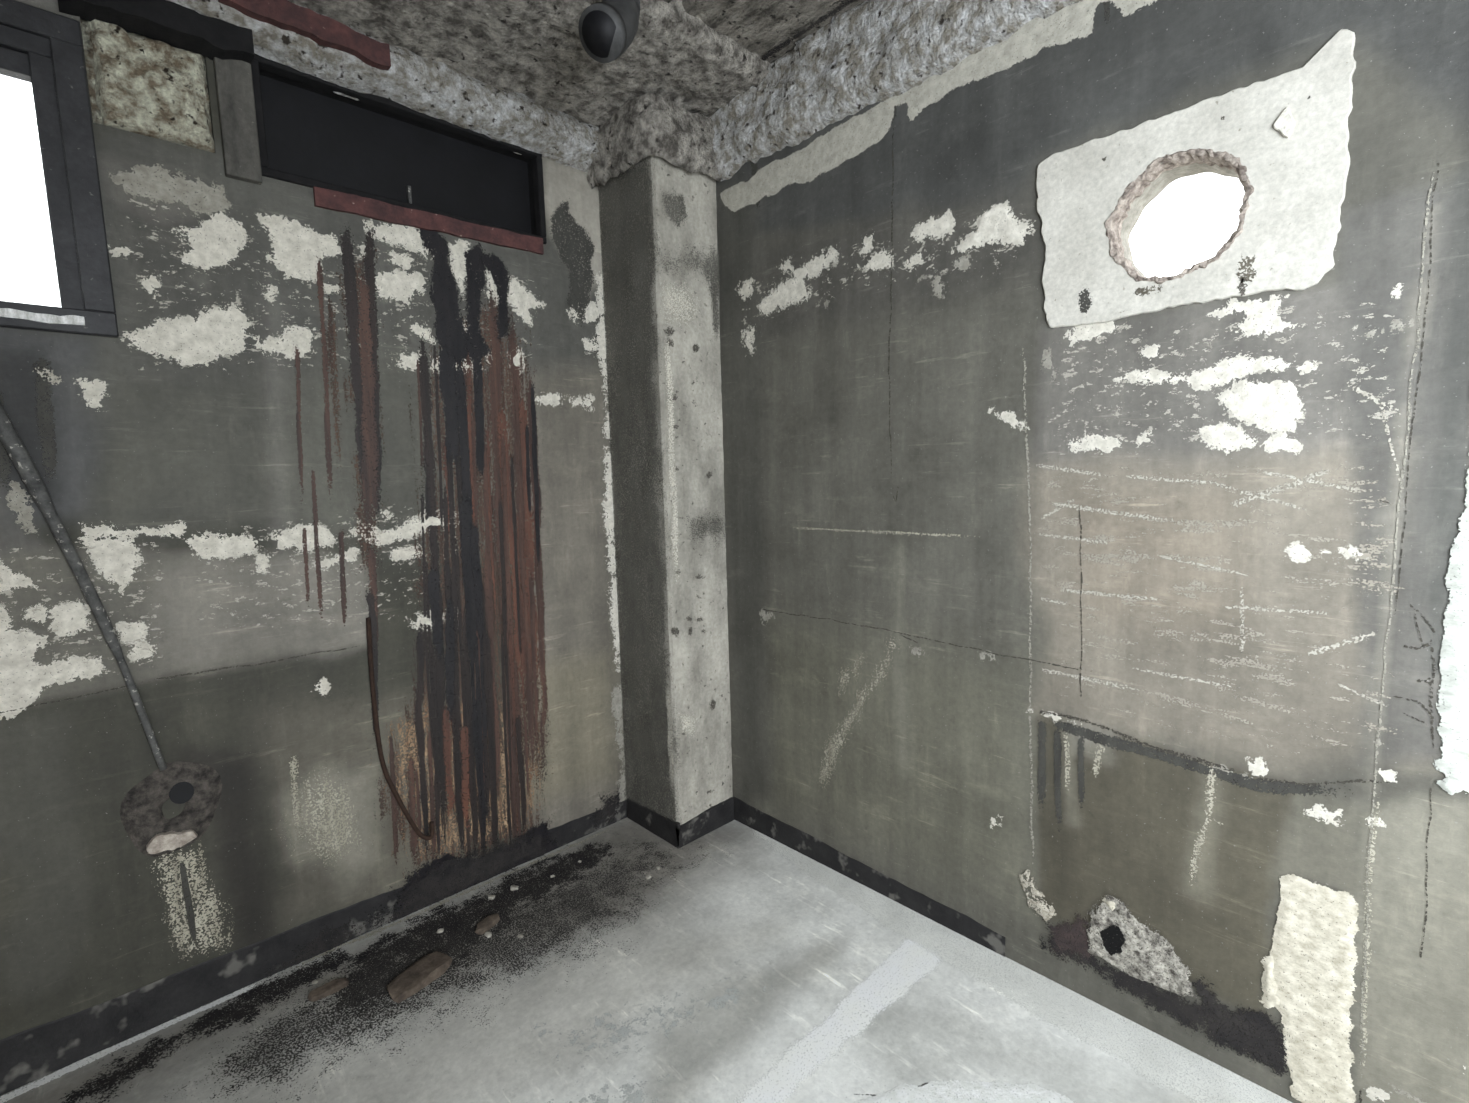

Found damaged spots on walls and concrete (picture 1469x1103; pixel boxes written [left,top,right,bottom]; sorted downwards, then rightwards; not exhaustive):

peeling [720,0,1157,212]
peeling [73,378,110,412]
peeling [107,163,546,378]
peeling [735,200,1036,356]
peeling [987,407,1030,432]
peeling [1041,283,1415,455]
peeling [0,480,459,720]
corrosion [294,222,556,878]
spalling [1433,455,1469,795]
damp [150,840,235,961]
damp [289,828,609,971]
spalling [1259,874,1425,1103]